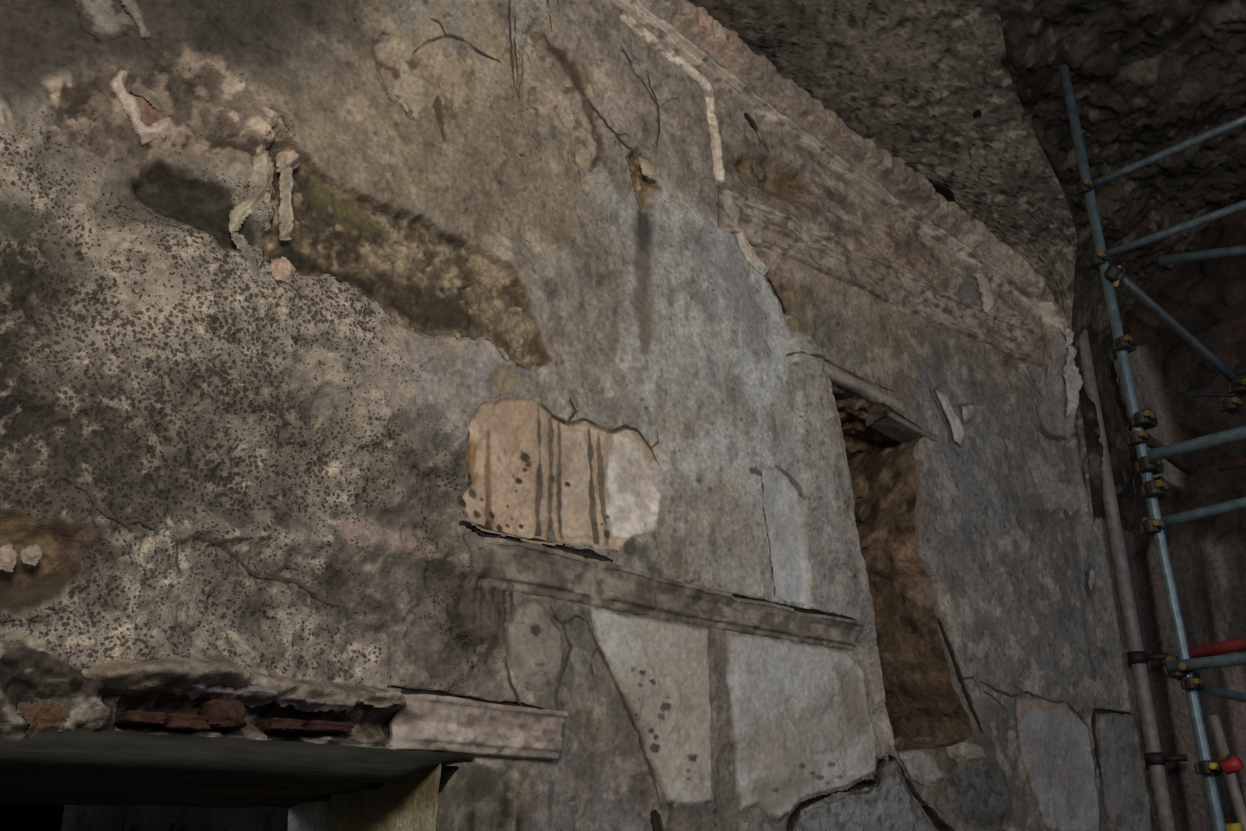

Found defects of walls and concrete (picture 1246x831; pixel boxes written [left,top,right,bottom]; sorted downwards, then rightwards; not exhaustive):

crack [412,0,518,89]
flaking render [109,68,173,145]
crack [583,48,679,159]
leakage [228,150,299,284]
spalling [258,120,555,372]
leakage [636,211,651,316]
spalling [930,385,982,456]
spalling [0,504,102,651]
crack [156,532,336,605]
crack [390,599,664,831]
crack [937,618,1135,777]
crack [787,755,955,831]